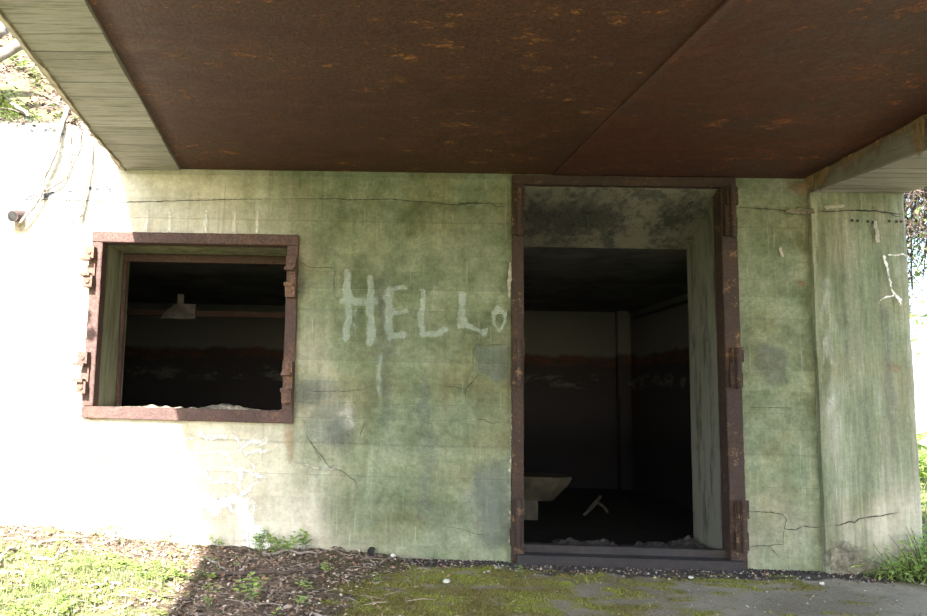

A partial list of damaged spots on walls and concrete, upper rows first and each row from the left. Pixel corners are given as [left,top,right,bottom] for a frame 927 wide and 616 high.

crack [0,198,503,207]
crack [821,207,901,217]
leakage [52,430,270,549]
crack [749,511,900,552]